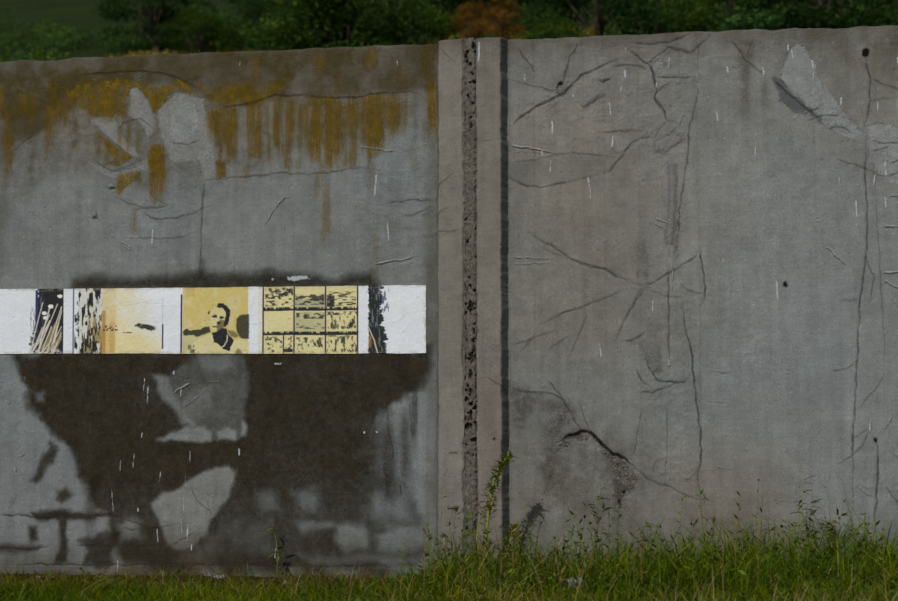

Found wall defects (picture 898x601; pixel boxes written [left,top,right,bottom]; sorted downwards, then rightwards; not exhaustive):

peeling [773,43,898,184]
damp [0,346,430,572]
crack [563,429,627,461]